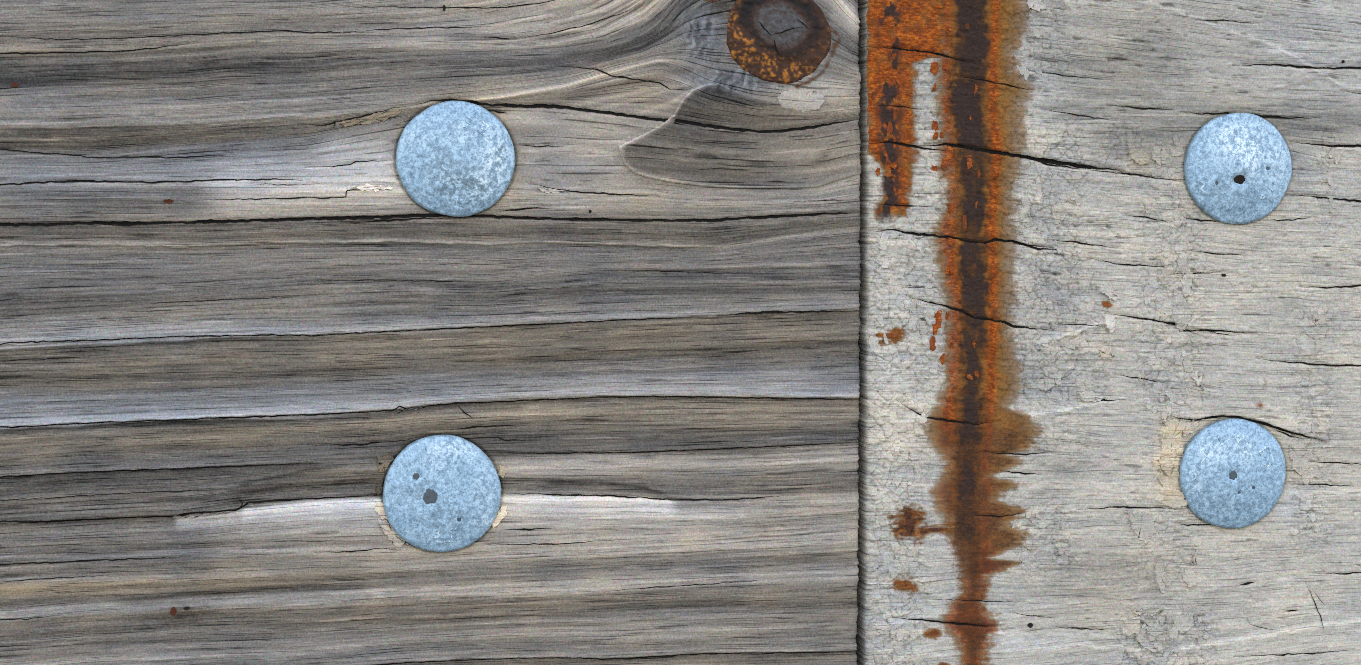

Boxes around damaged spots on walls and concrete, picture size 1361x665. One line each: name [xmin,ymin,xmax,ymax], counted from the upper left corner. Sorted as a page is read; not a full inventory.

crack [0,0,640,54]
crack [311,66,1183,182]
crack [872,47,1361,147]
crack [0,149,1246,274]
rust [866,0,1040,665]
peeling [1137,207,1204,509]
crack [1101,375,1358,486]
crack [0,556,182,582]
crack [497,528,613,545]
crack [378,651,852,665]
crack [614,580,757,591]
peeling [1120,556,1211,665]